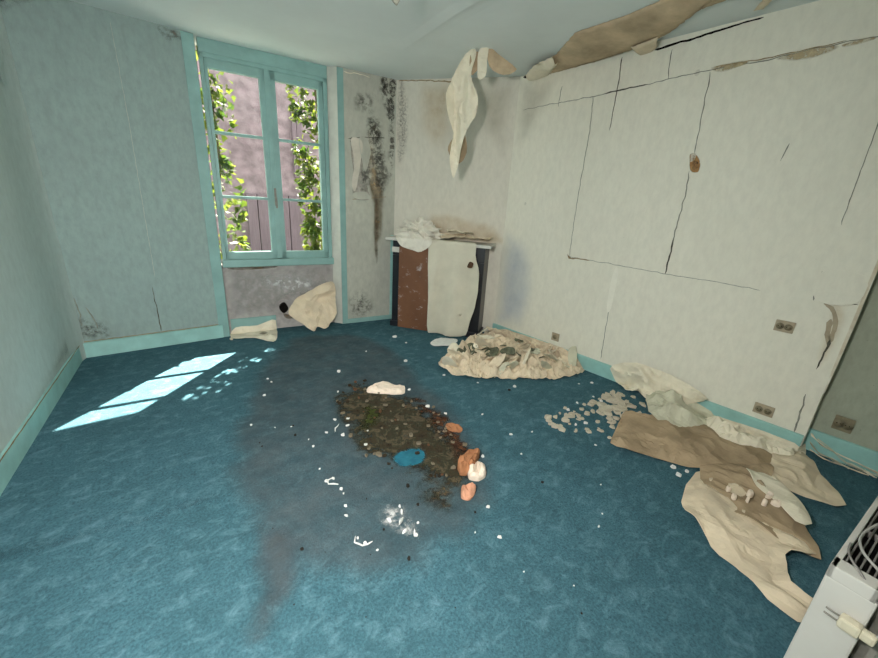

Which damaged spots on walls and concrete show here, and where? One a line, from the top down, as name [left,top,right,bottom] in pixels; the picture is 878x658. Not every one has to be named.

damp [361,78,454,254]
peeling [446,49,478,178]
rust [690,153,700,172]
crack [525,17,878,357]
peeling [813,269,868,306]